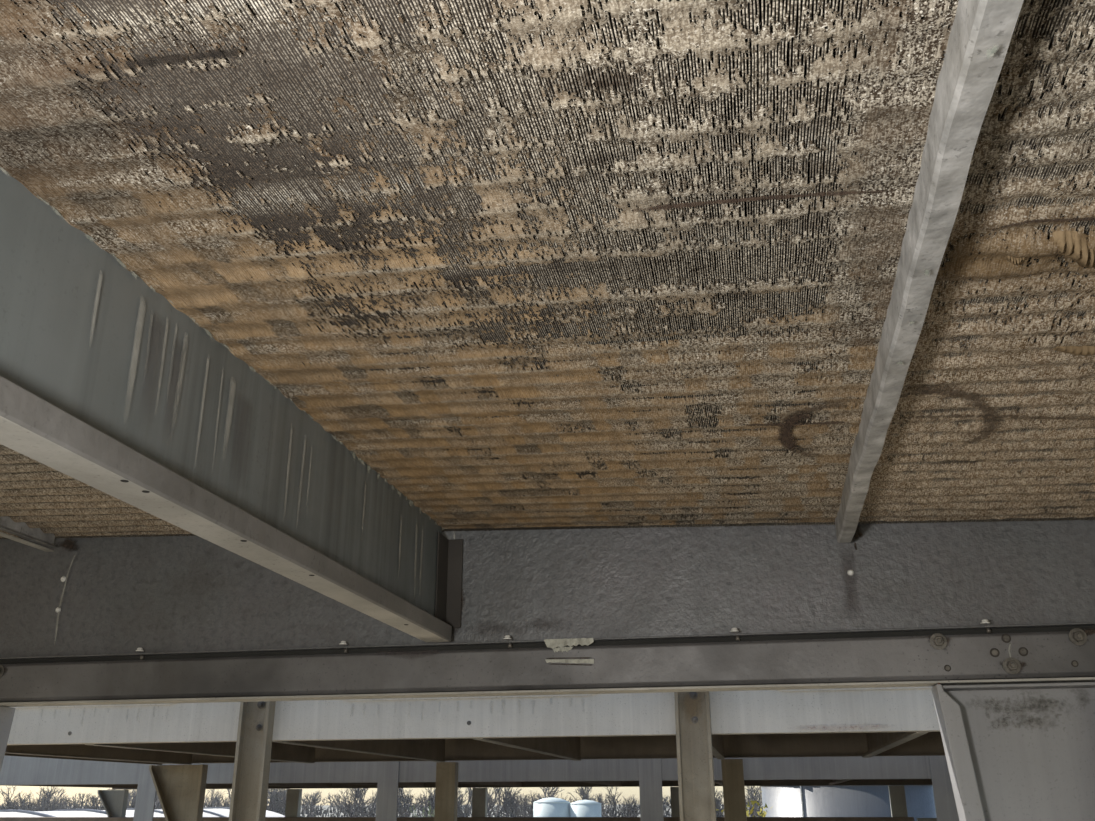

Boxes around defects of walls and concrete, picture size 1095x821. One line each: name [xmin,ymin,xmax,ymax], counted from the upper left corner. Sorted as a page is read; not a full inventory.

water stain [92,274,102,329]
water stain [130,302,153,389]
water stain [159,321,187,408]
water stain [198,360,209,440]
water stain [215,373,235,444]
water stain [743,403,845,457]
water stain [900,385,1095,446]